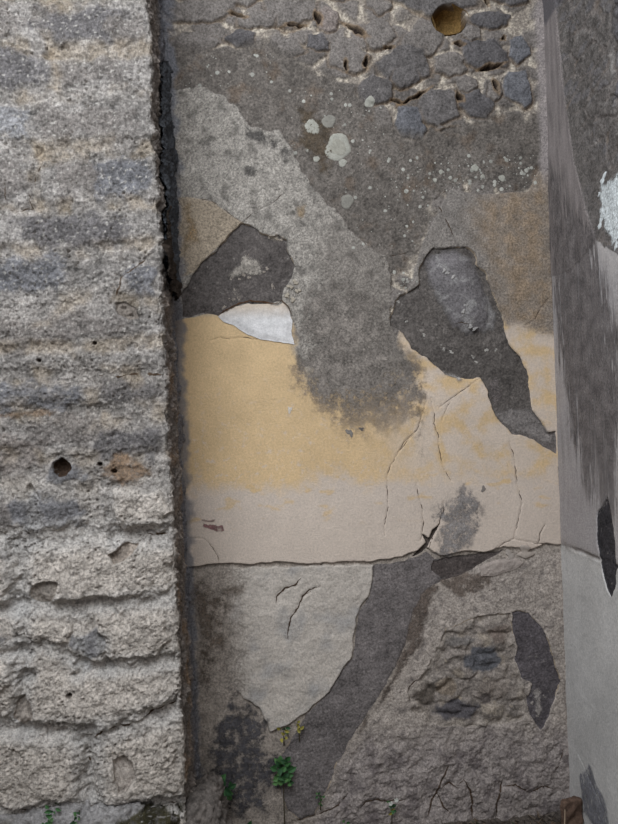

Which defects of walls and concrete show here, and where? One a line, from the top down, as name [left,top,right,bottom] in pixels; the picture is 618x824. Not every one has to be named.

spalling [158,61,301,345]
spalling [390,247,556,453]
crack [384,378,480,525]
crack [497,449,549,548]
damp [194,583,242,683]
crack [276,578,317,635]
spalling [279,525,534,820]
spalling [408,610,560,730]
damp [209,703,279,817]